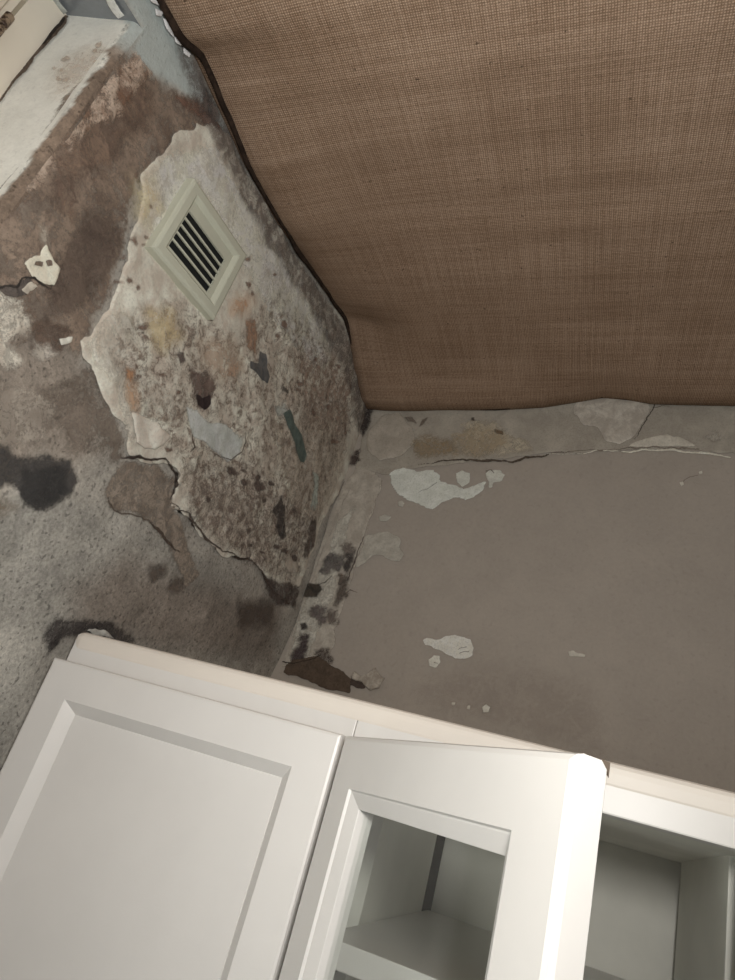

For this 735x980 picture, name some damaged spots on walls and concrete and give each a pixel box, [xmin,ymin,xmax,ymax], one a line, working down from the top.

peeling [106,0,124,19]
peeling [151,0,191,57]
peeling [65,52,153,149]
peeling [28,151,57,190]
peeling [0,226,60,368]
water stain [0,55,372,693]
peeling [33,96,735,668]
peeling [0,386,55,448]
crack [424,404,731,464]